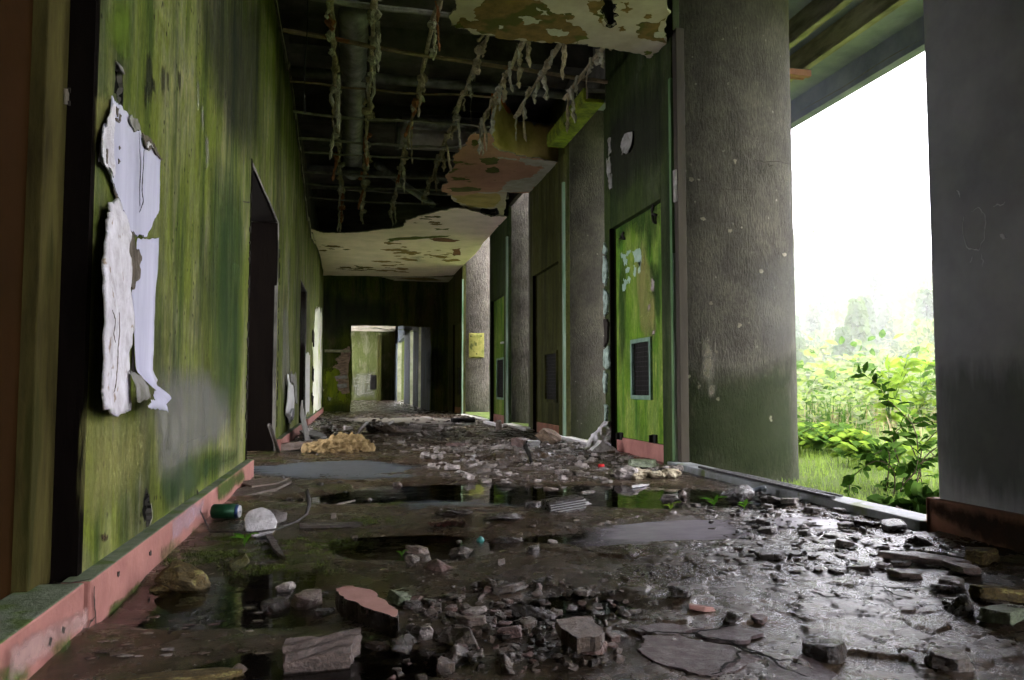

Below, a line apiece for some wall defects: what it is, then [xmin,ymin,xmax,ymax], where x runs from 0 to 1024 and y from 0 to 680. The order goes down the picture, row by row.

peeling [452,0,589,45]
peeling [618,14,666,55]
leakage [145,56,181,106]
leakage [204,0,260,145]
peeling [480,157,557,192]
peeling [606,132,633,189]
peeling [98,60,172,417]
peeling [338,216,461,273]
peeling [621,248,642,291]
peeling [276,249,351,427]
leakage [158,238,237,503]
leakage [161,504,203,559]